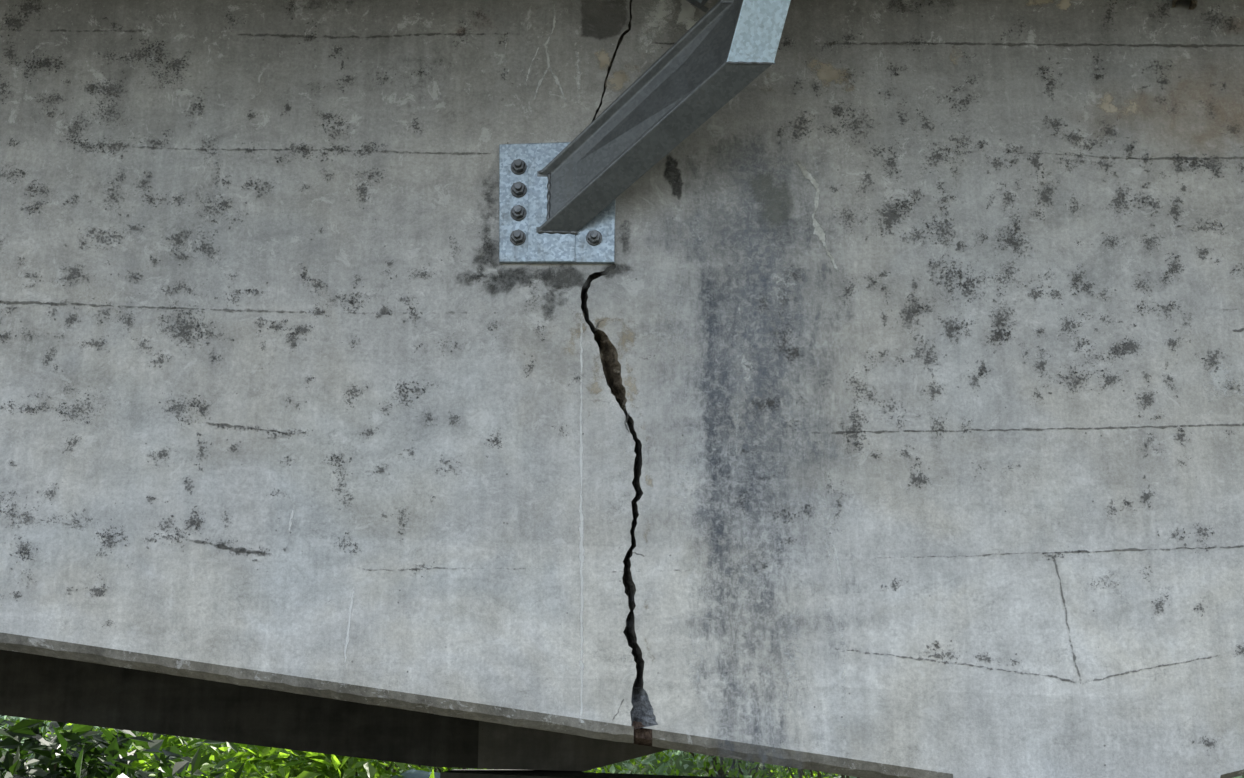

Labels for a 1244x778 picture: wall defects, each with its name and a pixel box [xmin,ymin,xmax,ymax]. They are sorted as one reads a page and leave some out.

crack [592,0,672,122]
leakage [93,271,234,368]
leakage [255,263,364,349]
leakage [385,228,587,340]
leakage [704,143,890,530]
leakage [841,92,1244,458]
leakage [0,383,101,453]
leakage [159,394,212,492]
leakage [0,484,126,569]
leakage [144,510,286,561]
crack [568,265,658,747]
crack [851,560,1211,683]